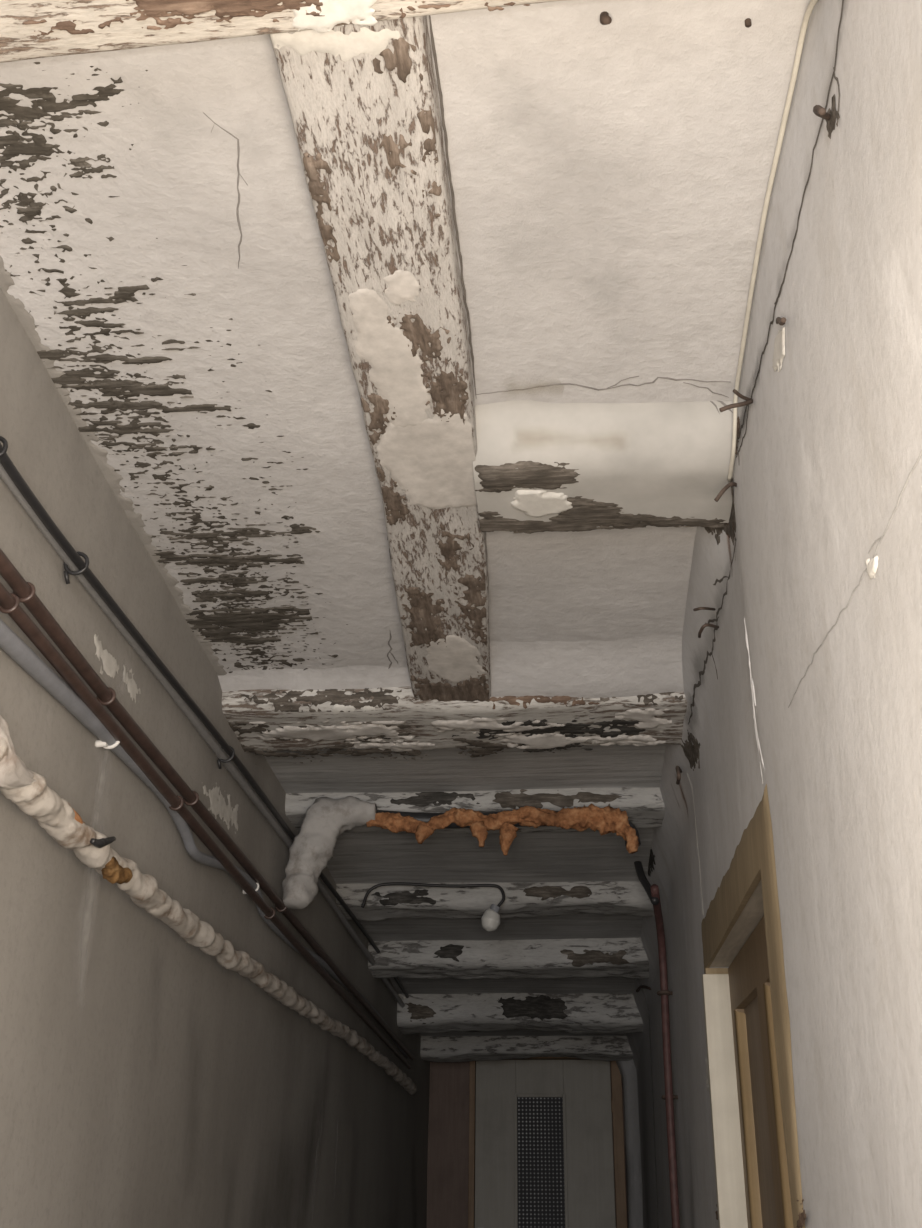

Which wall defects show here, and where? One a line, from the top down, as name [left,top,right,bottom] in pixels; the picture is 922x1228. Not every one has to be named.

peeling [22,0,378,39]
peeling [373,37,423,83]
crack [203,112,248,269]
peeling [303,153,340,262]
peeling [379,105,438,178]
peeling [0,100,330,670]
peeling [361,393,396,446]
peeling [387,311,469,423]
peeling [377,467,409,525]
peeling [400,461,736,648]
crack [688,540,736,724]
peeling [237,666,700,771]